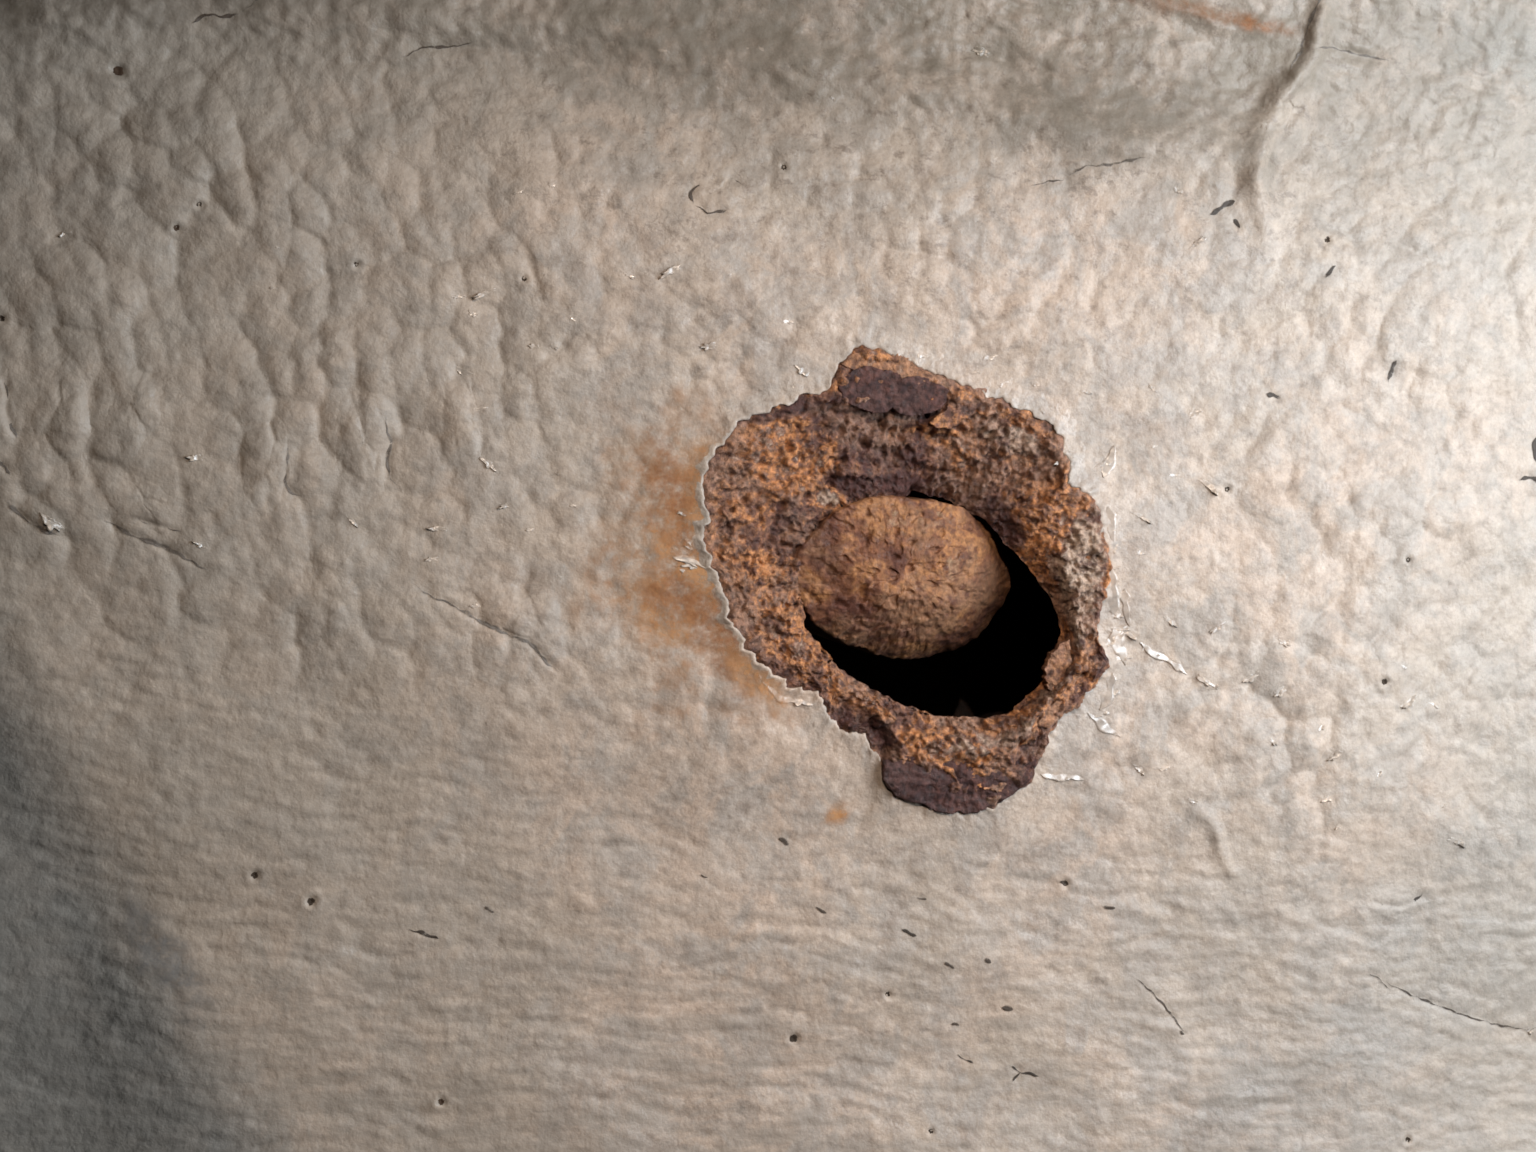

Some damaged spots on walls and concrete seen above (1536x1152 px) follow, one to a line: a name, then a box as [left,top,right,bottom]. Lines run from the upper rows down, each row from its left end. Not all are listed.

crack [423,592,564,676]
rust [627,345,1113,815]
peeling [671,323,1220,834]
crack [1371,975,1534,1030]